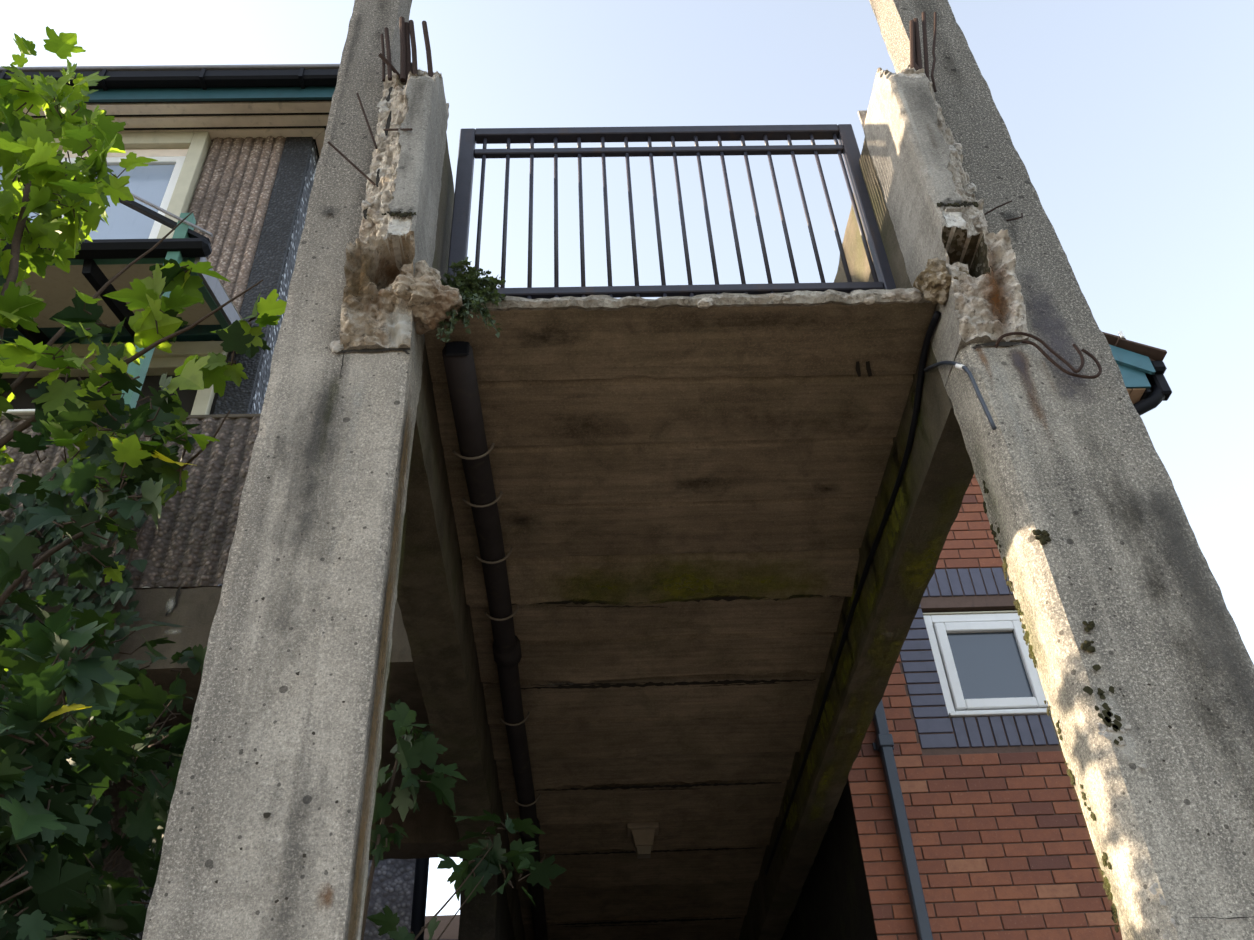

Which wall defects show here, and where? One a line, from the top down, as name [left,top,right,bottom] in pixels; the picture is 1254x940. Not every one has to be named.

spalling [329,65,1029,353]
spalling [1083,686,1131,749]